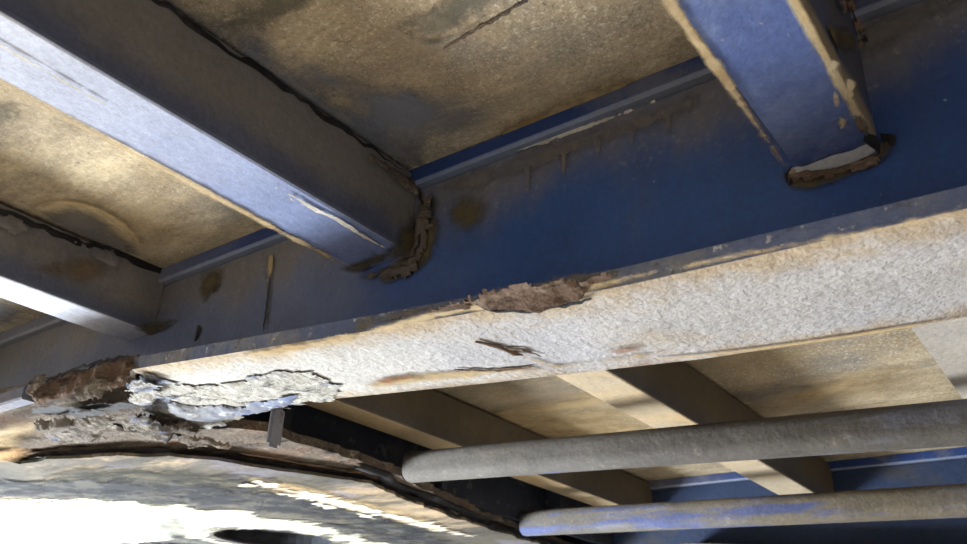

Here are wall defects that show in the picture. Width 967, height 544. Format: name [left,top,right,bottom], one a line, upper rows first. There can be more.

crack [444,0,528,49]
corrosion [498,82,630,137]
corrosion [663,0,778,154]
corrosion [1,85,437,282]
corrosion [785,133,896,188]
spalling [33,371,341,449]